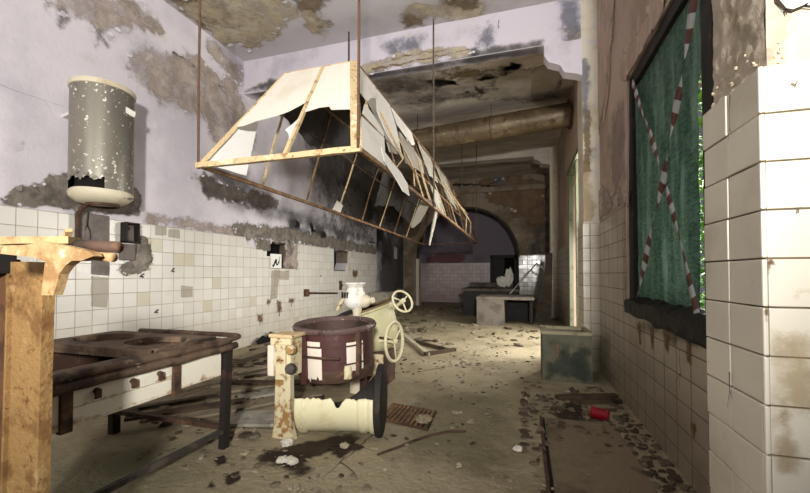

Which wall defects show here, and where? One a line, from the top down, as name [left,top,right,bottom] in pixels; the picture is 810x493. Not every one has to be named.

spalling [47,0,299,143]
spalling [362,46,475,75]
peeling [478,65,562,102]
damp [582,59,591,172]
spalling [91,236,154,278]
spalling [1,167,377,270]